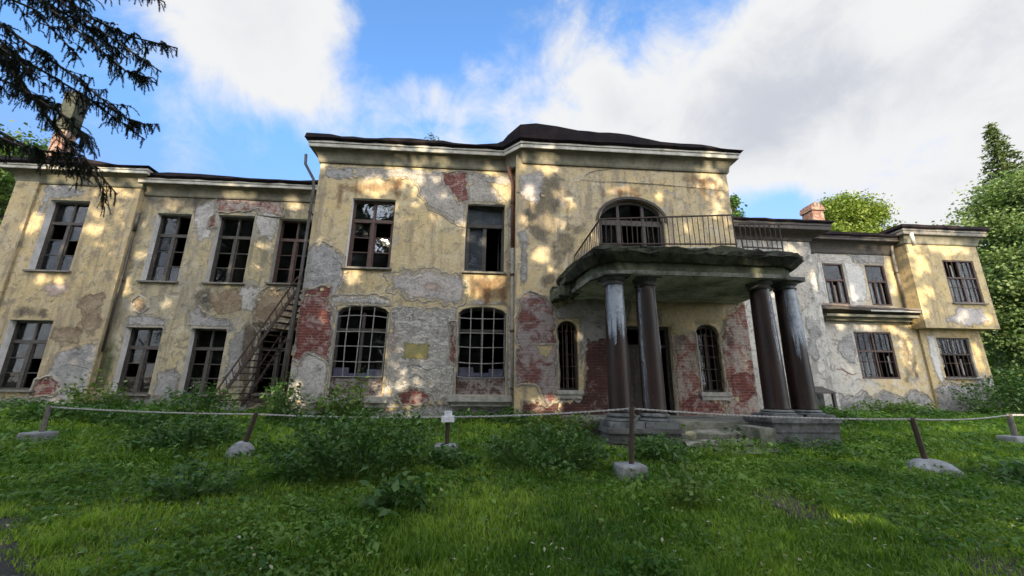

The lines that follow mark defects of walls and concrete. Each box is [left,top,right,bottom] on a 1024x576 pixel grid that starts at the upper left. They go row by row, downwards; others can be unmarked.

water stain [527,175,579,255]
peeling [0,283,105,406]
peeling [114,164,645,421]
spalling [660,302,760,416]
peeling [947,307,990,327]